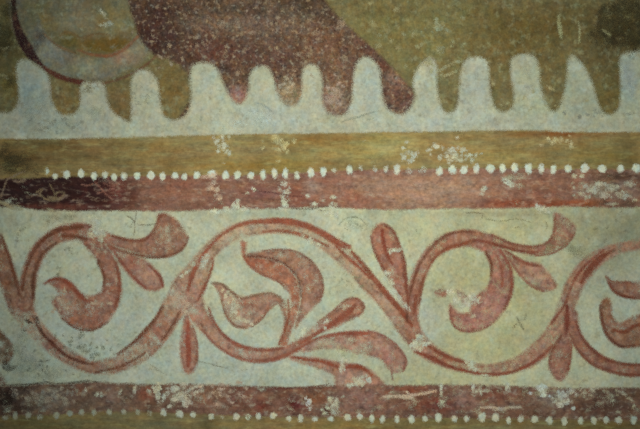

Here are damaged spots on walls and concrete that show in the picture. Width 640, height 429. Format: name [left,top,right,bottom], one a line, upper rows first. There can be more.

peeling [400,137,483,165]
peeling [570,173,637,207]
peeling [320,395,344,415]